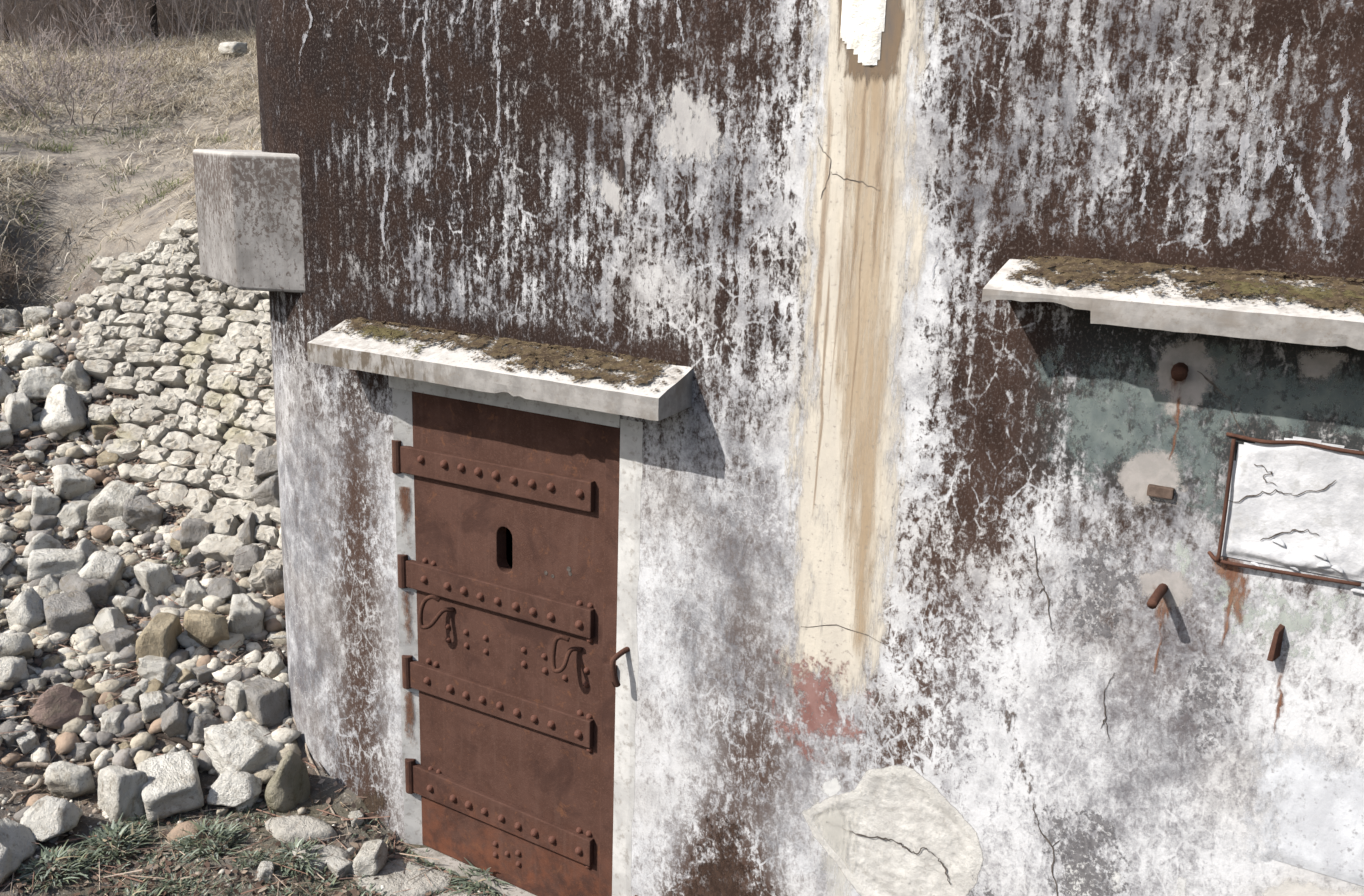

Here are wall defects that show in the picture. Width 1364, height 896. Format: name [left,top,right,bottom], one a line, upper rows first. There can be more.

leakage [413,2,429,115]
leakage [492,1,503,178]
leakage [1272,33,1292,84]
crack [818,139,879,199]
leakage [1232,61,1329,254]
leakage [1337,92,1352,161]
corrosion [398,486,410,522]
corrosion [403,591,412,638]
corrosion [1214,556,1250,643]
corrosion [404,692,414,736]
corrosion [1274,675,1283,727]
crack [1033,807,1061,896]